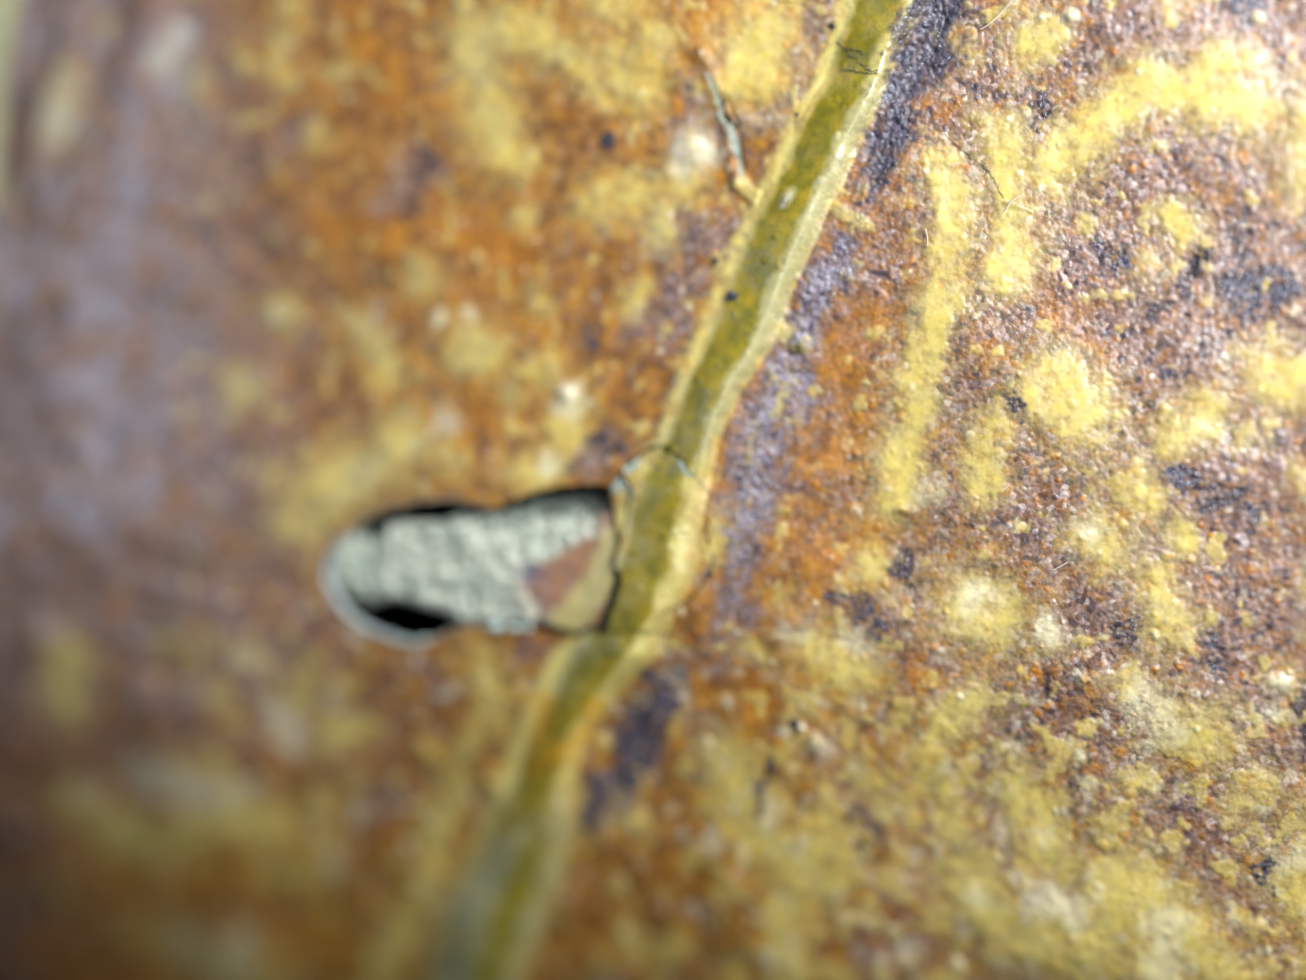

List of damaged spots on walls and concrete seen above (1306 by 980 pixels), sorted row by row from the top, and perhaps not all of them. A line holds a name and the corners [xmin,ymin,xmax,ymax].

spalling [322,445,713,647]
crack [535,444,715,638]